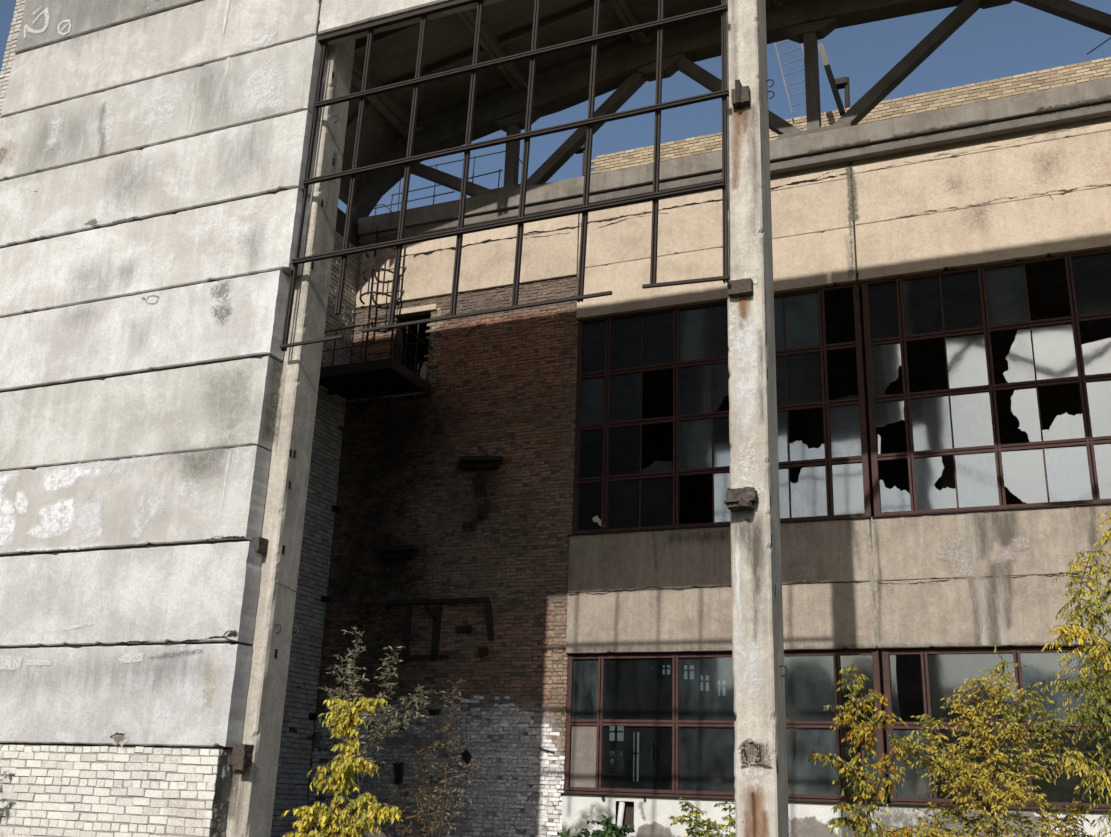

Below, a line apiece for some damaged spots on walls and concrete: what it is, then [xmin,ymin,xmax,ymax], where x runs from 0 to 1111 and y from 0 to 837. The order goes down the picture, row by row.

crack [761,126,1086,189]
crack [414,199,722,257]
crack [856,184,1111,225]
peeling [0,455,165,551]
peeling [131,481,202,538]
crack [773,574,1083,609]
damp [967,512,1016,645]
spalling [741,736,778,791]
rust [746,791,766,837]
flaking render [789,815,839,837]
flaking render [939,809,1046,837]